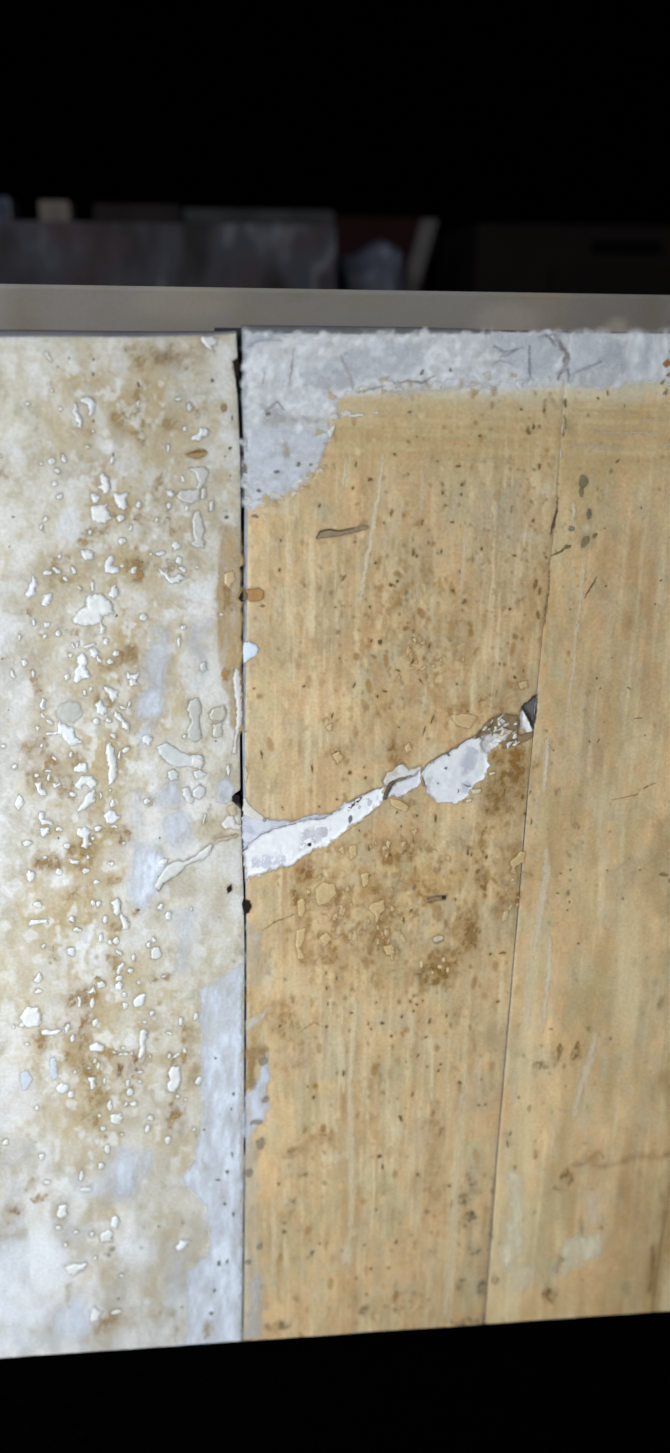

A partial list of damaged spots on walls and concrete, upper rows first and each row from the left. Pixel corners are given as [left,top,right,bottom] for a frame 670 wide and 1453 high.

peeling [201,336,218,350]
peeling [45,352,96,448]
peeling [221,329,670,518]
spalling [317,510,393,538]
water stain [138,640,166,717]
peeling [514,670,537,728]
peeling [12,397,270,1192]
water stain [129,784,186,907]
spalling [296,711,502,961]
water stain [115,1154,148,1194]
water stain [183,968,243,1345]
peeling [55,1205,119,1275]